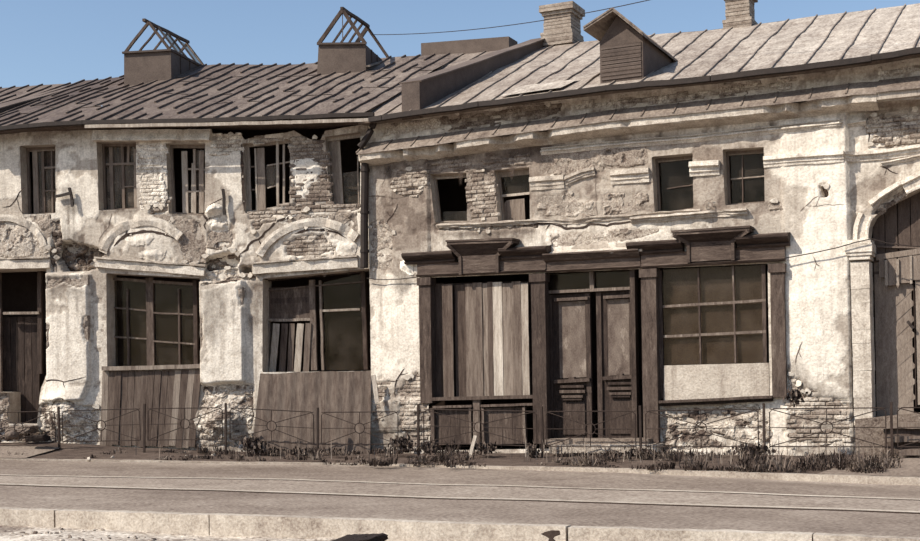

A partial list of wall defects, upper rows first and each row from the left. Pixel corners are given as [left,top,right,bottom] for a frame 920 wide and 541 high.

spalling [864,106,920,148]
spalling [0,214,90,288]
crack [99,213,173,246]
spalling [136,141,256,306]
crack [203,144,246,229]
crack [240,215,346,256]
spalling [209,132,396,271]
spalling [390,166,431,198]
spalling [435,166,651,234]
spalling [540,147,648,176]
flaking render [661,404,773,451]
spalling [784,372,855,449]